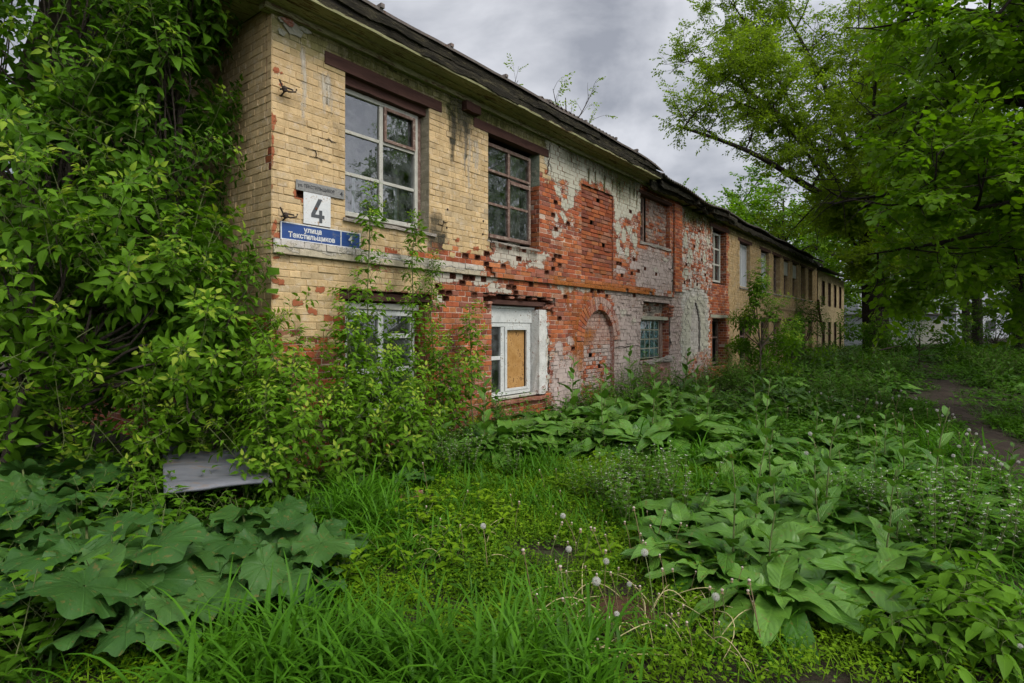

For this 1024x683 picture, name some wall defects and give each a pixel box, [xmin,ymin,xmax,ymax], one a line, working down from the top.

peeling [272,139,712,411]